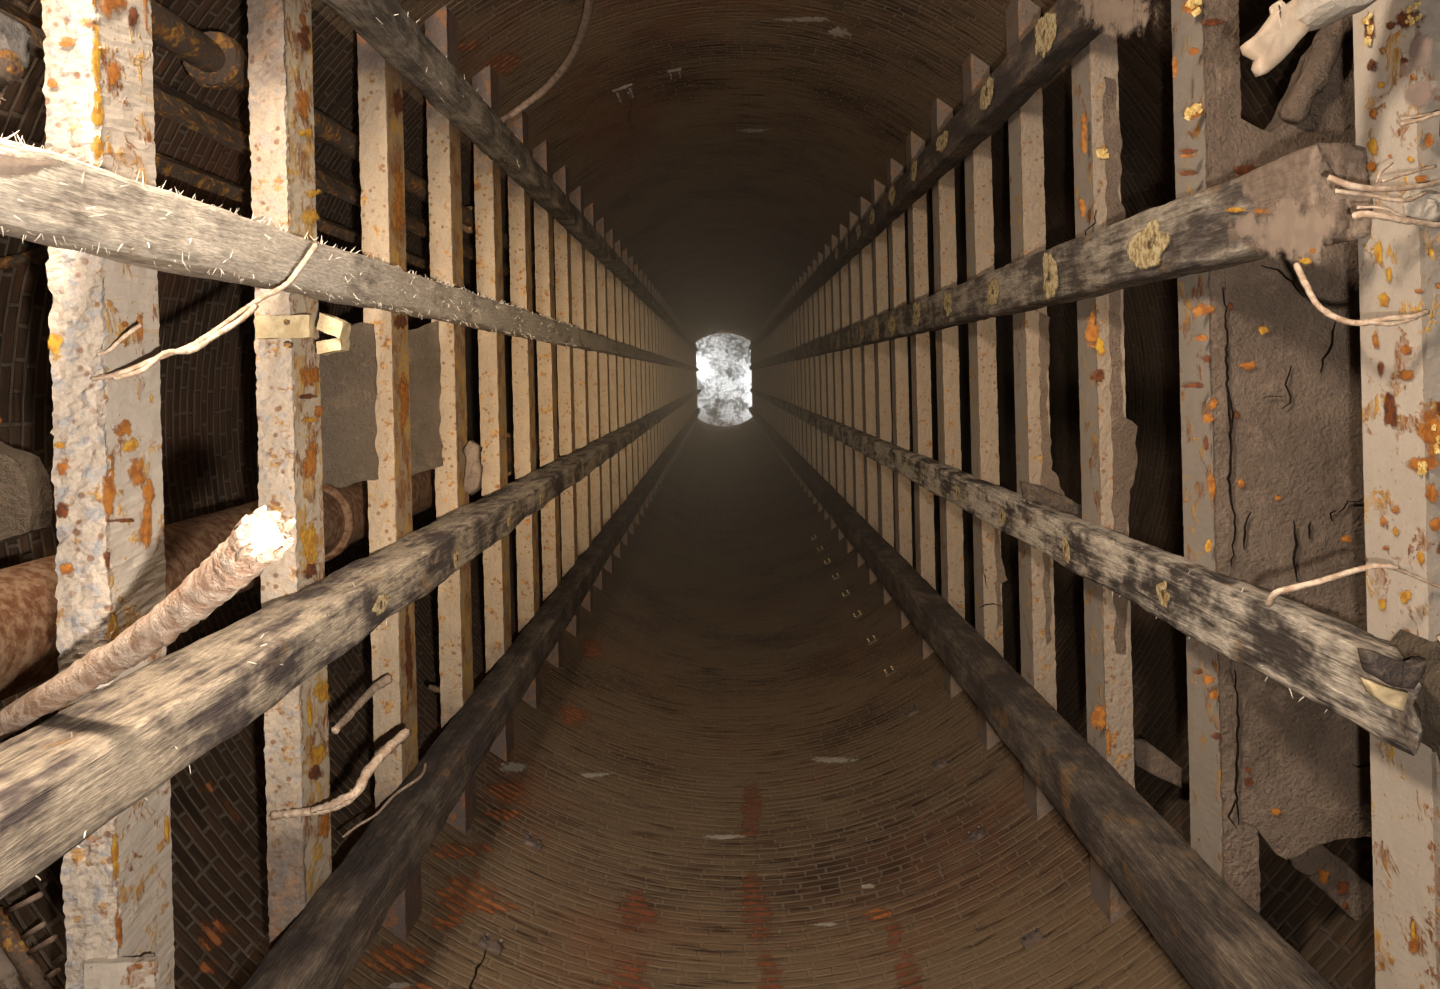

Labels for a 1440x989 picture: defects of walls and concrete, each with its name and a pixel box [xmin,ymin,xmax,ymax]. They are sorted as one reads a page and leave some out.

corrosion [1183,0,1223,26]
corrosion [1361,1,1424,89]
corrosion [90,0,147,161]
corrosion [1184,103,1203,121]
corrosion [1374,241,1391,307]
corrosion [48,333,63,358]
corrosion [1372,331,1413,428]
corrosion [55,502,69,518]
corrosion [102,420,155,548]
corrosion [303,441,317,480]
corrosion [301,523,318,579]
crack [1227,670,1240,828]